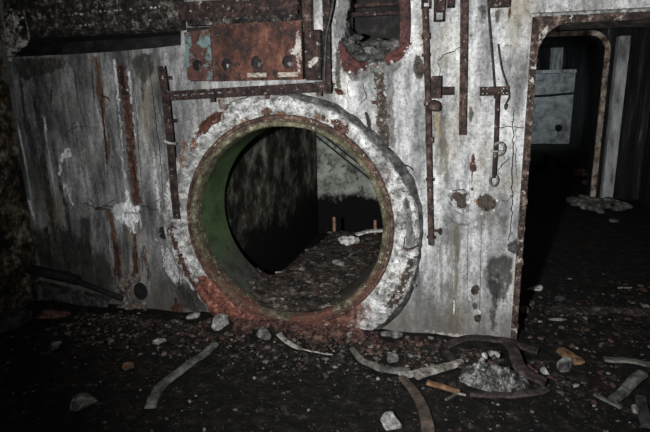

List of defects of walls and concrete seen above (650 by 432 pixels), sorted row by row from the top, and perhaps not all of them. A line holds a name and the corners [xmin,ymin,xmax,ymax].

rust [91,56,114,178]
water stain [112,190,142,234]
crack [498,110,524,240]
rust [197,275,254,321]
water stain [485,255,512,330]